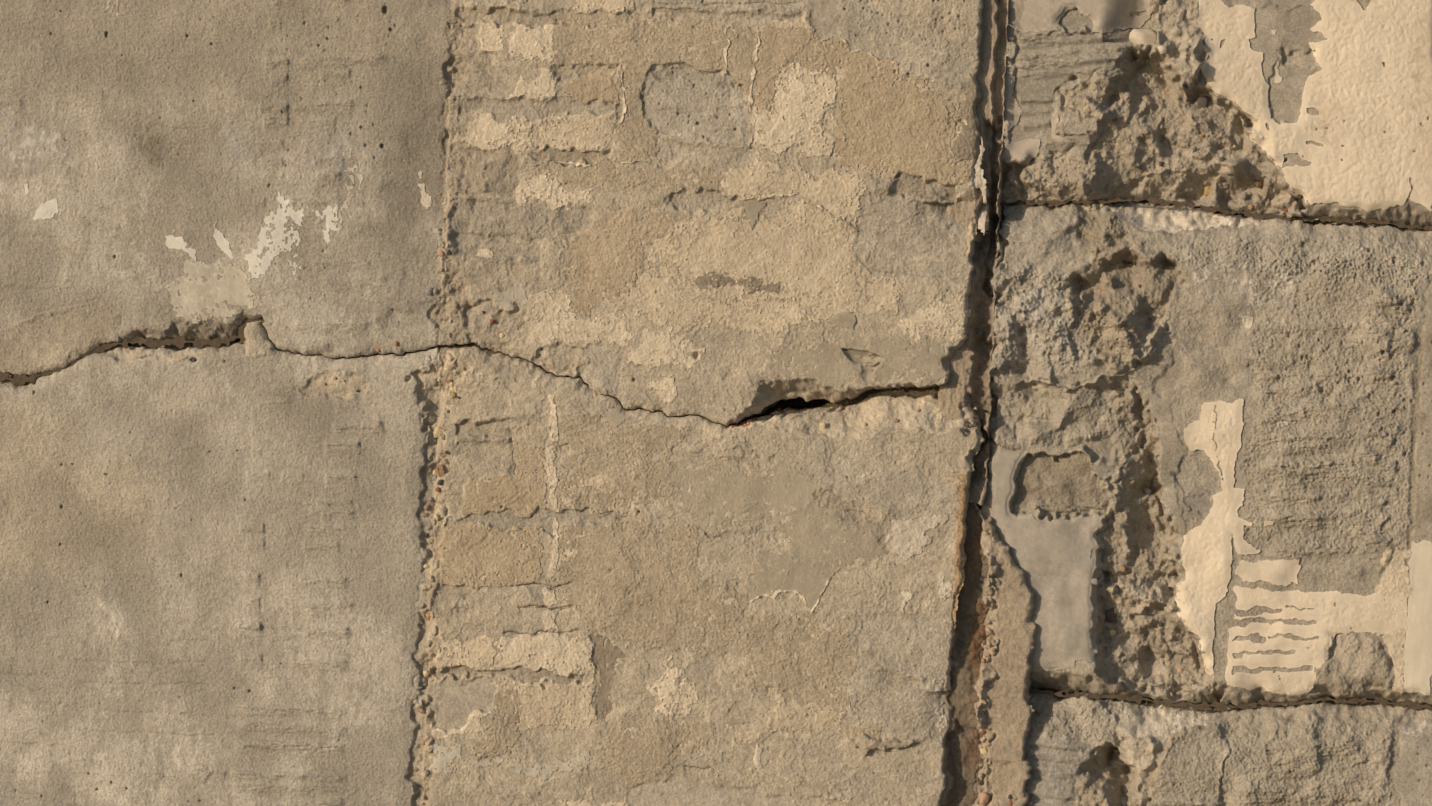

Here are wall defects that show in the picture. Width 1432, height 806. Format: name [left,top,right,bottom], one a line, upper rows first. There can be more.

crack [0,317,939,428]
peeling [407,0,1432,806]